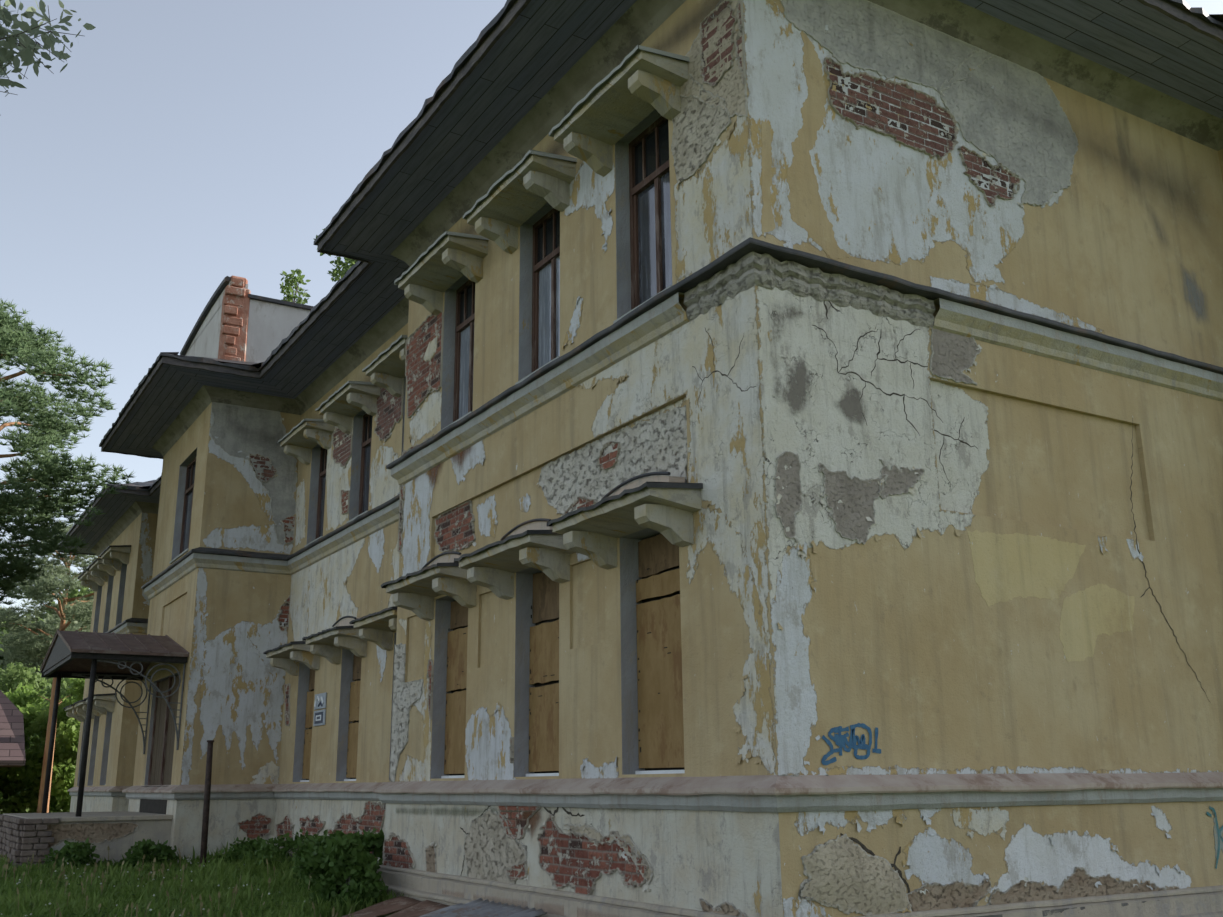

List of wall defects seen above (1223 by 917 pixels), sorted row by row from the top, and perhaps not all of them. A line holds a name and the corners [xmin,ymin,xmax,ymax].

peeling [671,0,1105,334]
crack [812,301,978,486]
peeling [181,311,498,785]
peeling [519,286,1220,779]
crack [1130,418,1211,703]
flaking render [237,801,437,873]
flaking render [463,806,654,895]
peeling [783,880,849,917]
peeling [794,806,1192,917]